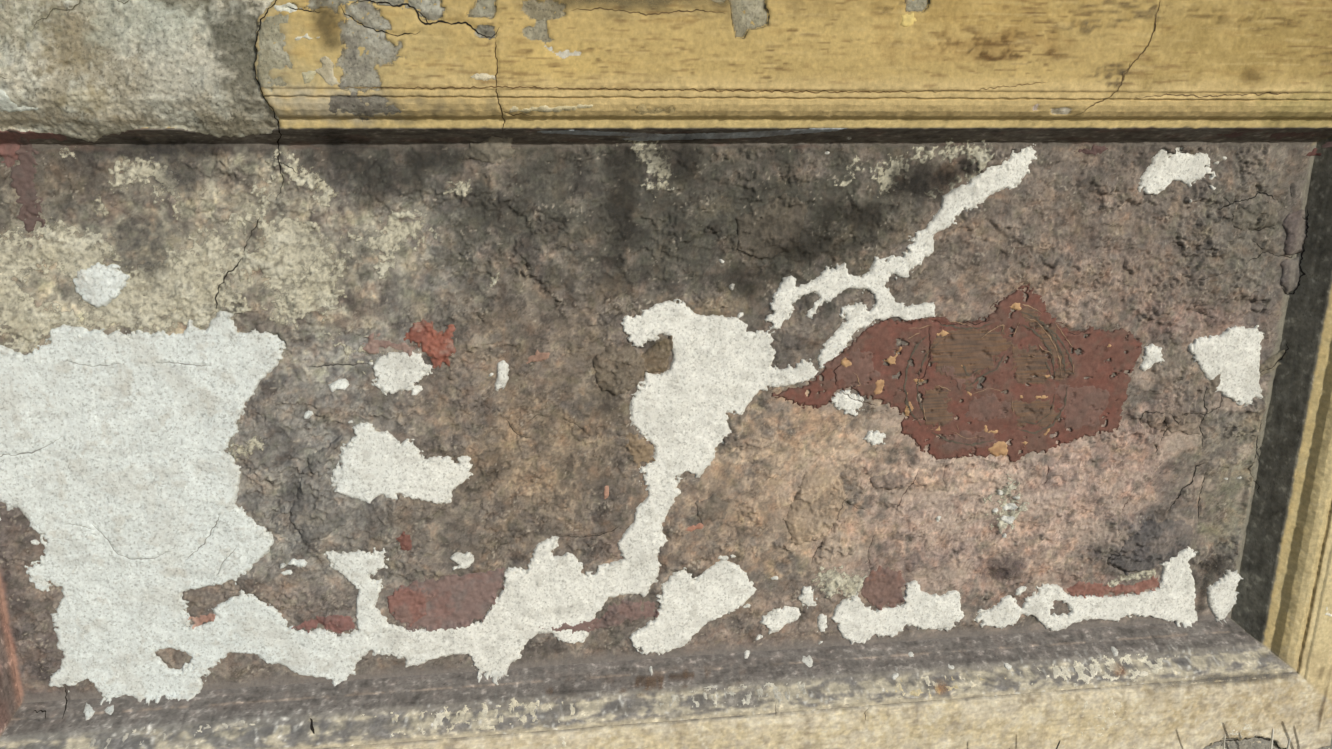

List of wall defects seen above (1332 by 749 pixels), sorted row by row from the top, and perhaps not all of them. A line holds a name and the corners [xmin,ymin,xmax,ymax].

crack [1077,3,1298,115]
crack [215,0,1048,309]
flaking render [1137,147,1227,203]
flaking render [0,0,1037,720]
flaking render [1139,344,1165,372]
flaking render [1188,325,1264,407]
flaking render [744,547,1243,667]
peeling [89,720,255,749]
peeling [360,698,575,749]